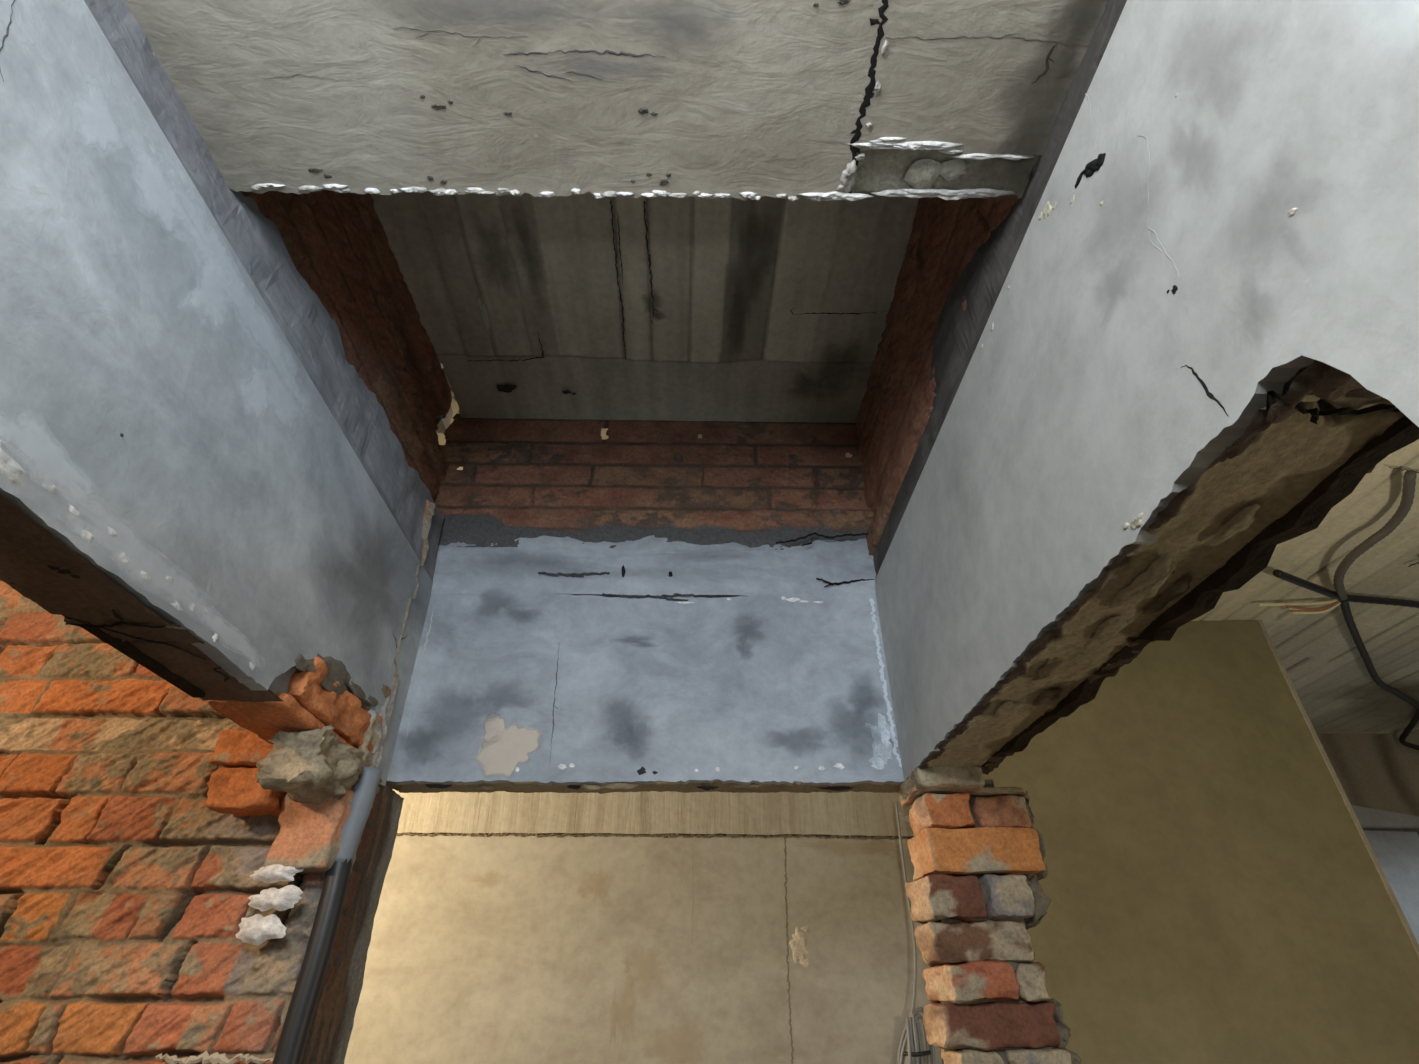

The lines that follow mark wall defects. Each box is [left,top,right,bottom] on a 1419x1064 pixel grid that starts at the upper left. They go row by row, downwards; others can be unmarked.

crack [0,0,15,81]
crack [848,0,1089,193]
spalling [251,168,520,196]
spalling [538,122,1034,202]
crack [1183,365,1228,416]
flaking render [295,653,399,768]
leakage [478,714,540,776]